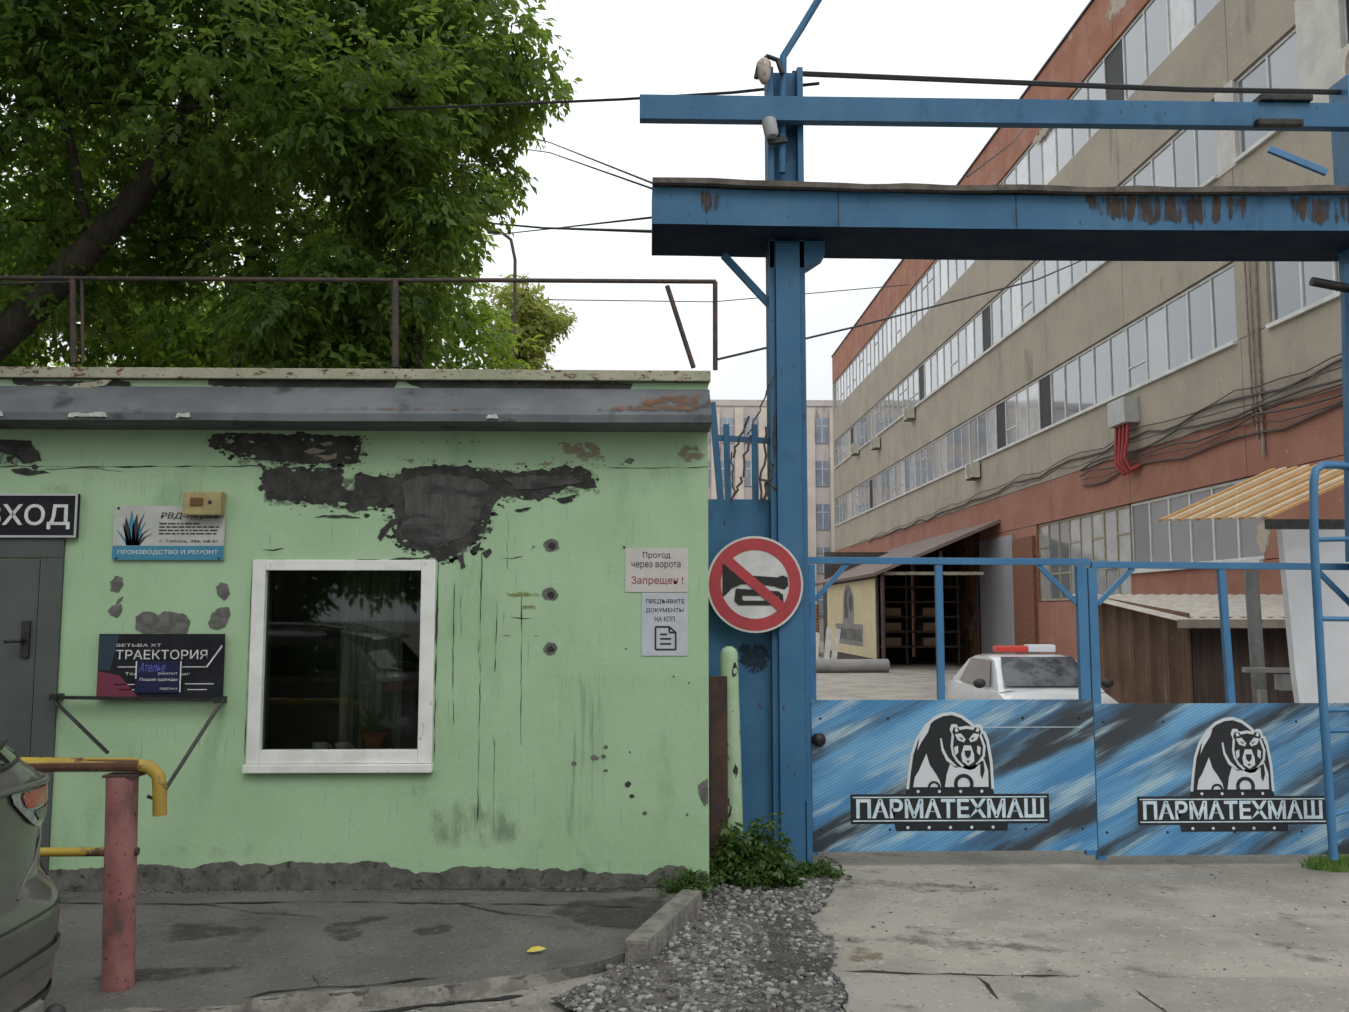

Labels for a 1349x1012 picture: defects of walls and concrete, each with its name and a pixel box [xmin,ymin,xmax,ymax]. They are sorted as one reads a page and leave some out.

rust [701,191,720,213]
rust [1085,194,1246,224]
rust [1290,196,1349,225]
rust [599,394,700,410]
flaking render [0,439,49,475]
peeling [678,445,704,462]
flaking render [205,431,634,760]